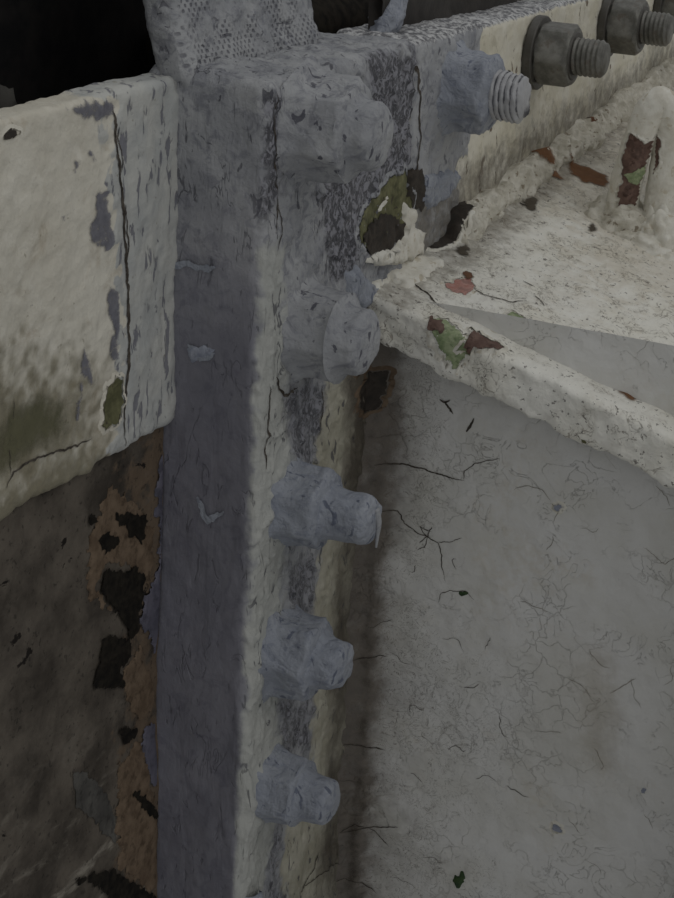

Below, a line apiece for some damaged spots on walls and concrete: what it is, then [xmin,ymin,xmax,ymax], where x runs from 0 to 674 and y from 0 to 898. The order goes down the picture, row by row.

peeling [355,163,478,289]
crack [113,110,131,446]
peeling [440,271,479,298]
peeling [98,372,128,435]
crack [440,399,474,432]
crack [7,439,91,486]
crack [378,458,500,481]
peeling [99,511,148,554]
crack [382,510,474,603]
peeling [94,566,146,690]
peeling [133,790,159,819]
peeling [75,868,156,898]